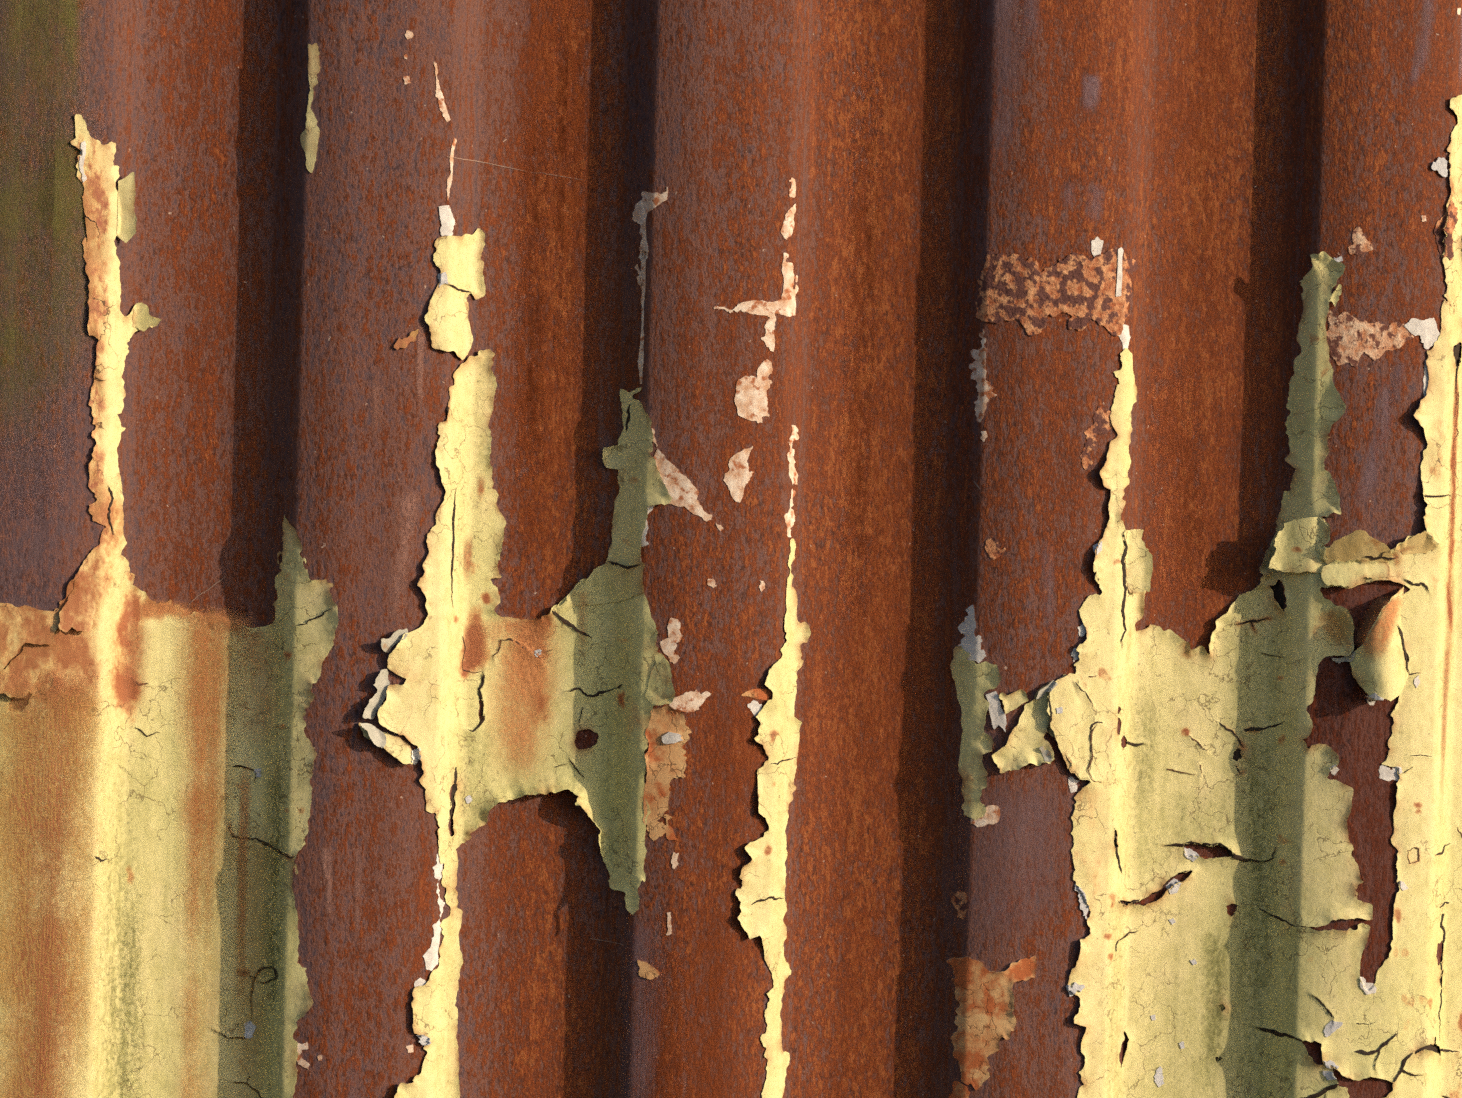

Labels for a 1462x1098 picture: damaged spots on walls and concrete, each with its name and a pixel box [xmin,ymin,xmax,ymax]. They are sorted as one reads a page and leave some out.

peeling [734,359,773,423]
peeling [0,114,338,1098]
rust [469,622,548,761]
peeling [359,228,692,1098]
crack [462,610,592,732]
crack [1120,531,1128,648]
peeling [946,95,1462,1098]
rust [0,698,92,1098]
rust [322,849,331,911]
peeling [735,489,811,1098]
crack [1114,832,1276,951]
crack [1303,902,1459,1098]